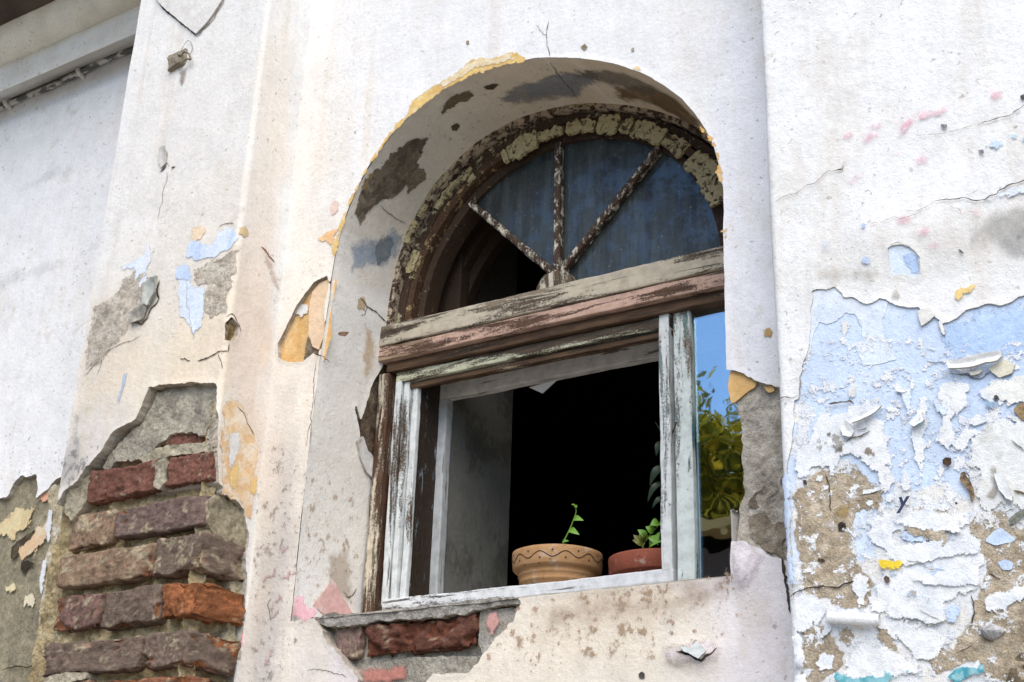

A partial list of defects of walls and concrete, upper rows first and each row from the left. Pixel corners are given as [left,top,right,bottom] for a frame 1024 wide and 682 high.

crack [536,21,580,98]
leakage [502,70,698,126]
spalling [318,52,525,279]
crack [775,161,847,202]
crack [871,180,1024,224]
spalling [85,242,160,369]
spalling [176,223,249,341]
spalling [281,273,349,362]
peeling [955,284,976,300]
spalling [0,385,258,682]
peeling [728,287,1024,682]
flaking render [292,580,521,682]